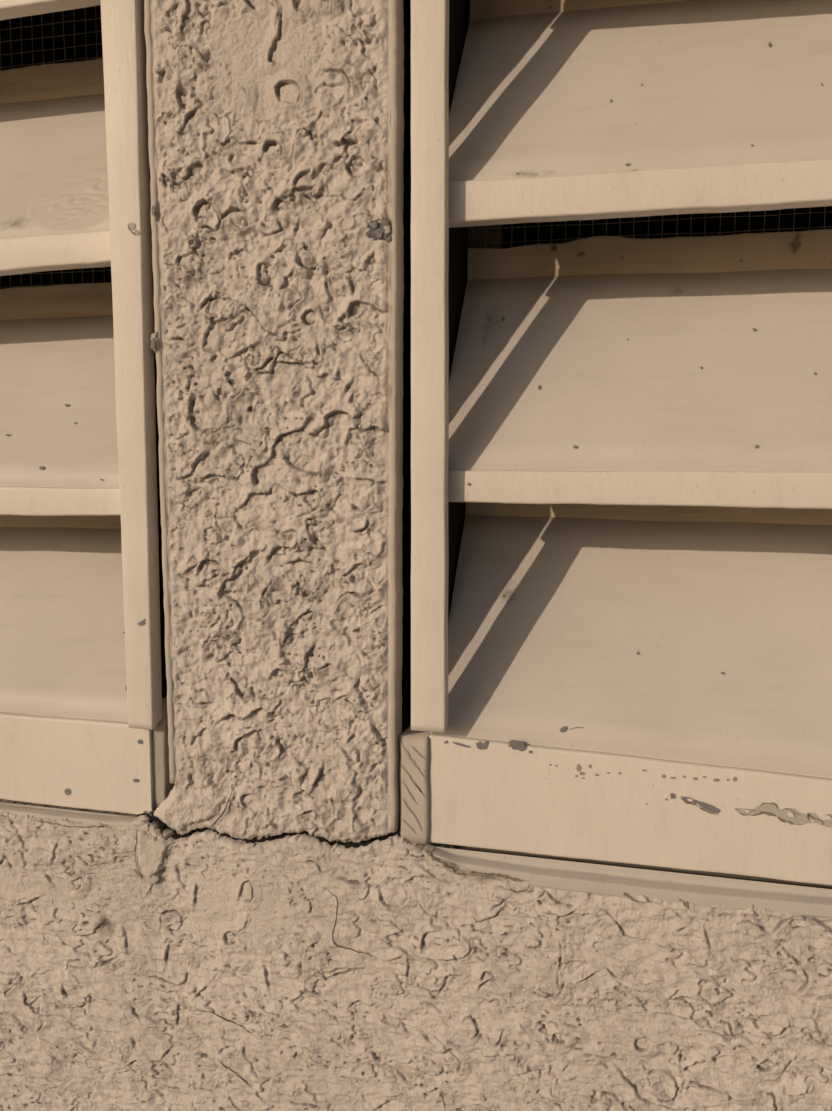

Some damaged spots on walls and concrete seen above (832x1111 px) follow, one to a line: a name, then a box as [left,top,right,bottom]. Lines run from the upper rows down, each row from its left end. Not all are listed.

crack [132,742,426,905]
peeling [665,793,720,815]
peeling [735,802,832,827]